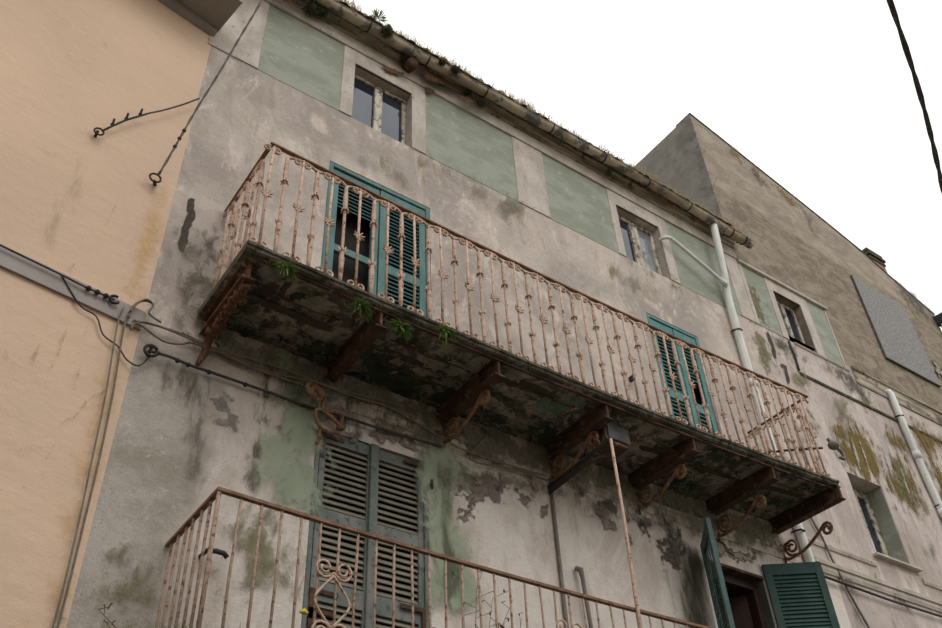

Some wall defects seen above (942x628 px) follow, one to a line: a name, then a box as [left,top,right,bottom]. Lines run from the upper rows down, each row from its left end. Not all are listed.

peeling [237,258,348,321]
water stain [246,443,262,490]
peeling [226,310,548,613]
spalling [594,509,688,574]